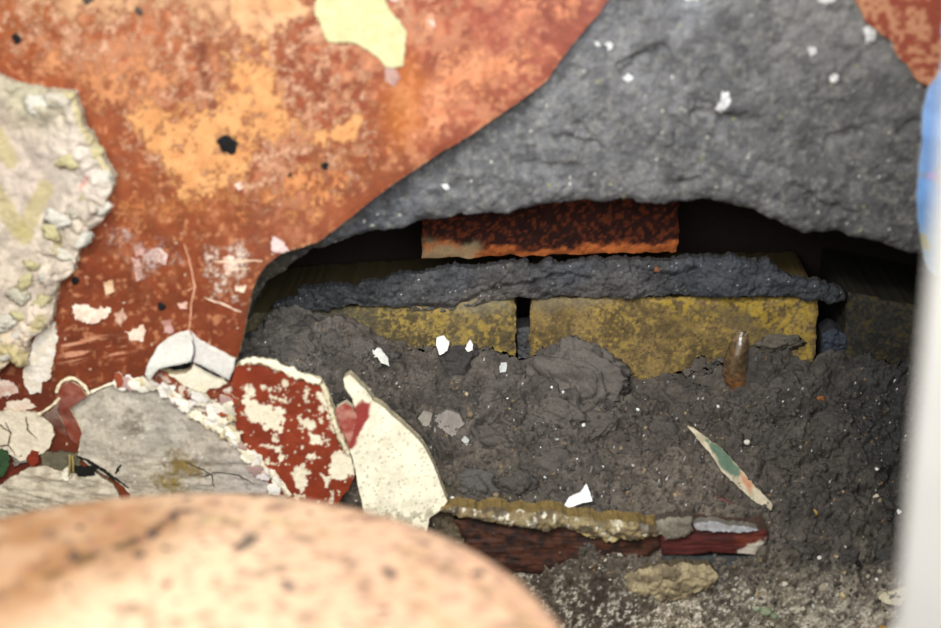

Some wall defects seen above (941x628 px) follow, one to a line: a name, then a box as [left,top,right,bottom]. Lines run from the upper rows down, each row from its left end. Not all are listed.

peeling [408,0,581,141]
peeling [0,0,456,497]
flaking render [418,408,470,445]
flaking render [564,483,592,507]
peeling [693,516,758,533]
flaking render [877,587,898,606]